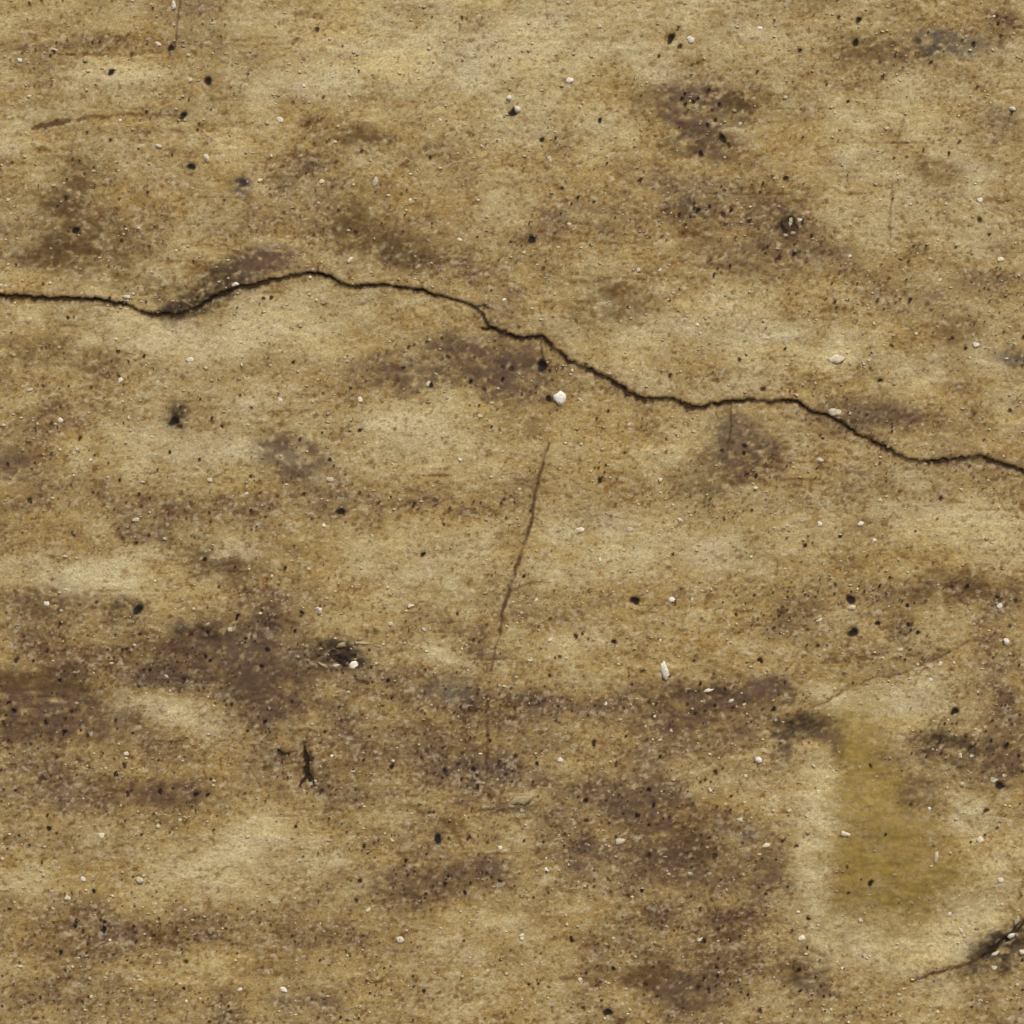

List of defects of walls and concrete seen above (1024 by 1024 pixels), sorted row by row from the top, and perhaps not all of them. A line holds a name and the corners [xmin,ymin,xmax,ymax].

crack [0,271,1024,474]